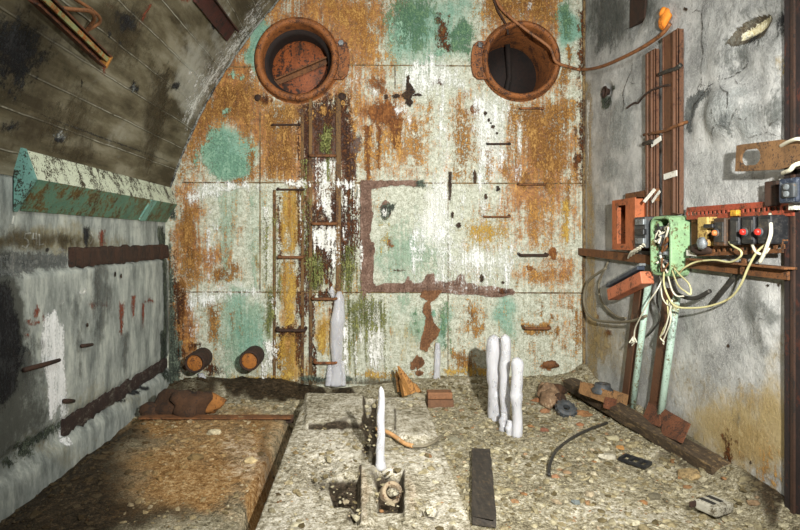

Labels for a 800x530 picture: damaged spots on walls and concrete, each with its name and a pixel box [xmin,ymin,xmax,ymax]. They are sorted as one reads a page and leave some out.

leakage [0,10,52,100]
peeling [382,0,476,61]
peeling [185,125,251,281]
leakage [193,181,258,197]
leakage [286,123,391,384]
corrosion [172,0,584,382]
leakage [0,282,72,446]
corrosion [707,415,784,488]